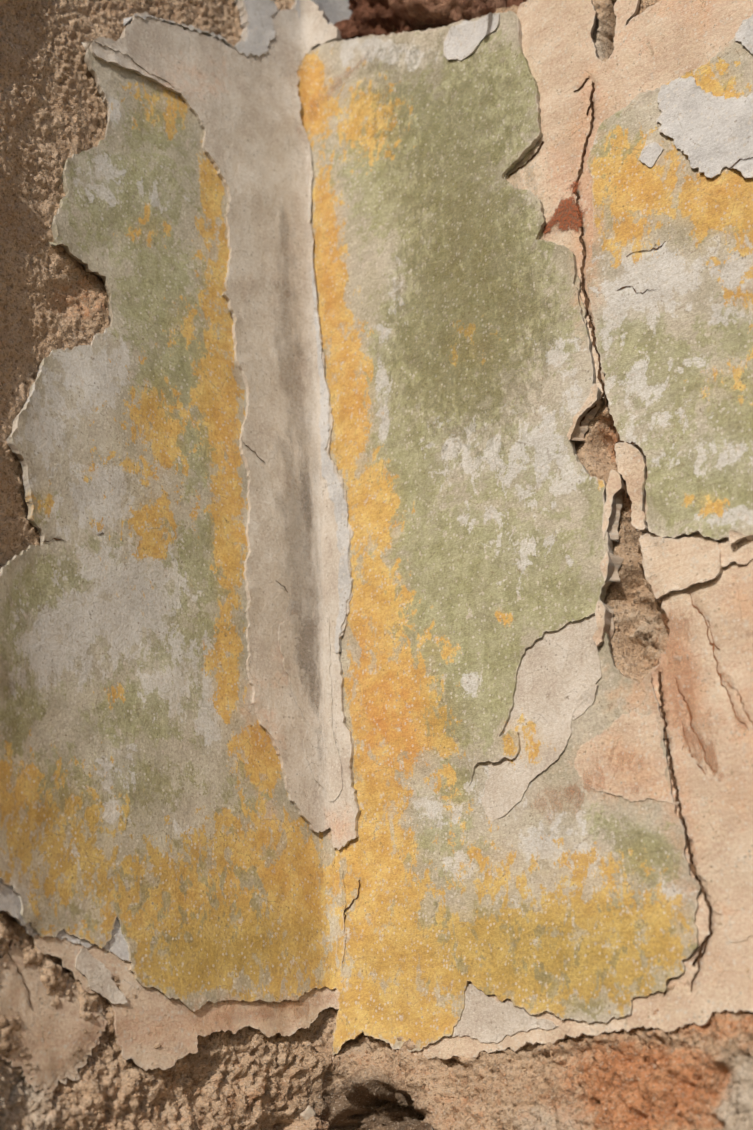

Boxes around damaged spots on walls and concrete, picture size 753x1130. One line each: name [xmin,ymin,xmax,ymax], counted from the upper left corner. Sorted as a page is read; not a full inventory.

crack [573,78,609,426]
peeling [0,0,361,1095]
peeling [297,0,753,1060]
crack [615,440,635,498]
crack [658,671,717,997]